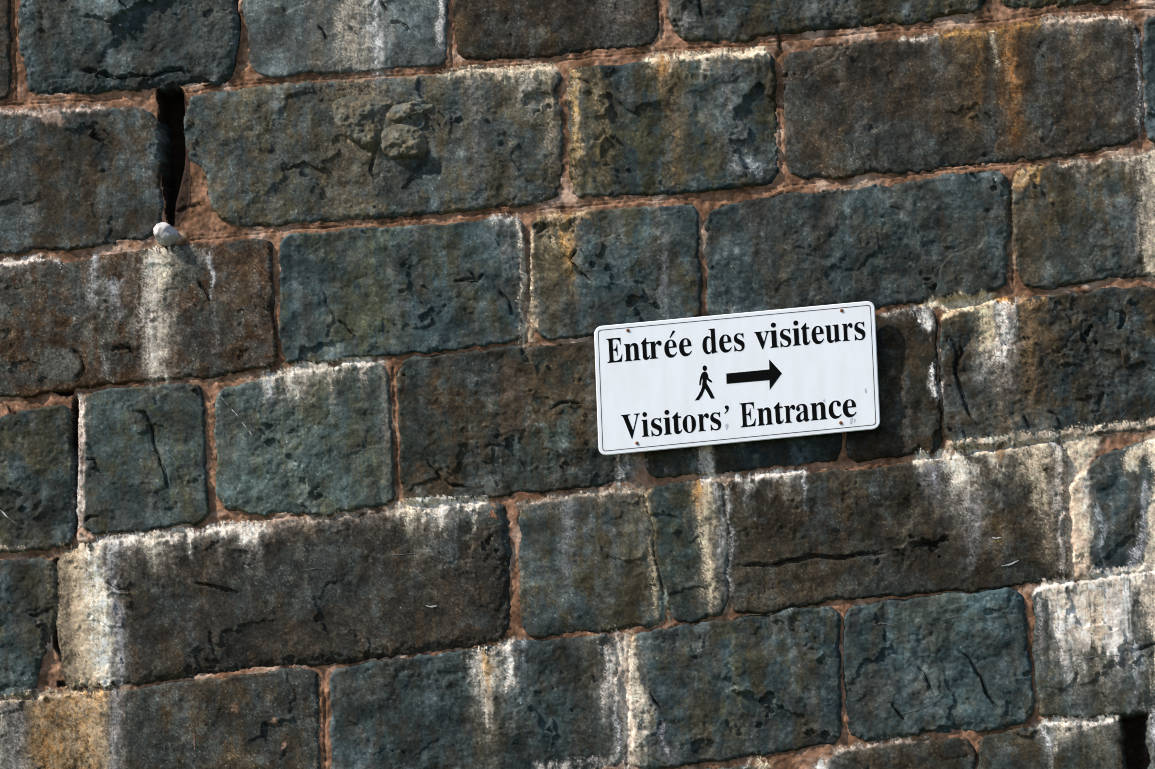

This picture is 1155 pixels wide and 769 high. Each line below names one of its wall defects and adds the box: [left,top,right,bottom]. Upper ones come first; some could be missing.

leakage [334,0,385,96]
leakage [1058,144,1155,279]
leakage [87,253,120,306]
leakage [136,245,177,382]
leakage [261,356,384,396]
leakage [883,289,1018,373]
leakage [74,394,85,528]
leakage [913,418,1155,692]
leakage [0,495,488,769]
leakage [467,637,526,727]
leakage [540,629,669,769]
leakage [1040,714,1120,751]